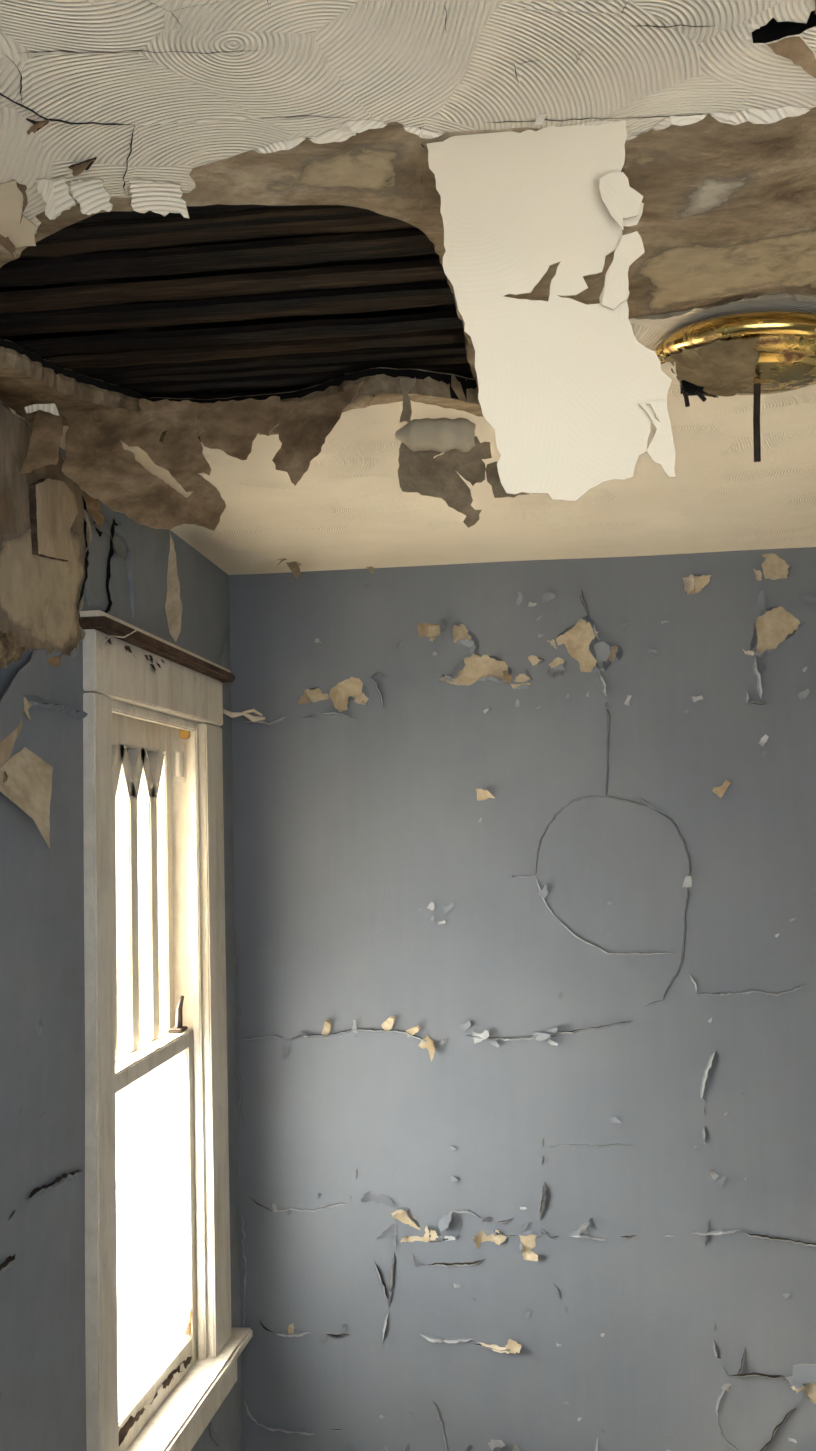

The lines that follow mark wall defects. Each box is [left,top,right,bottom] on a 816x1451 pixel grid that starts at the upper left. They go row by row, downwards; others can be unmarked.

crack [632,19,717,31]
hole [752,10,816,43]
crack [0,40,350,194]
crack [483,114,702,123]
peeling [0,119,540,417]
peeling [505,105,816,319]
peeling [0,364,165,858]
peeling [417,592,623,709]
crack [237,590,805,1062]
crack [0,1254,15,1274]
crack [9,1170,82,1219]
peeling [360,1190,548,1262]